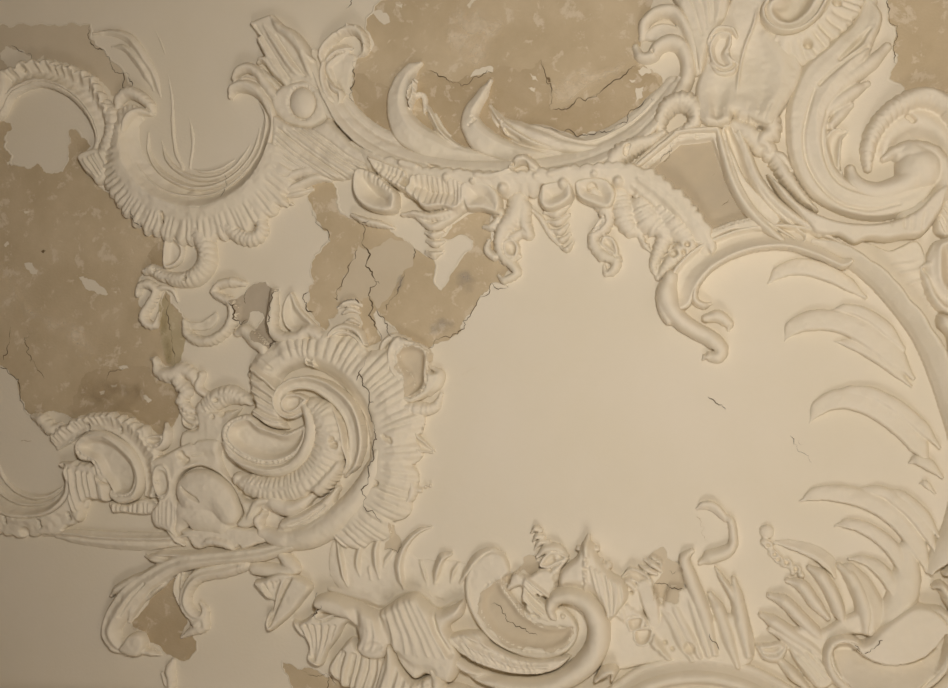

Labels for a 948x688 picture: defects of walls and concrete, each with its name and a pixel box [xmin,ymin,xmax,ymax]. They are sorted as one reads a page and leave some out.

peeling [349,0,666,148]
peeling [885,0,948,93]
peeling [0,120,188,435]
peeling [302,182,510,399]
peeling [131,576,198,662]
peeling [281,660,350,688]